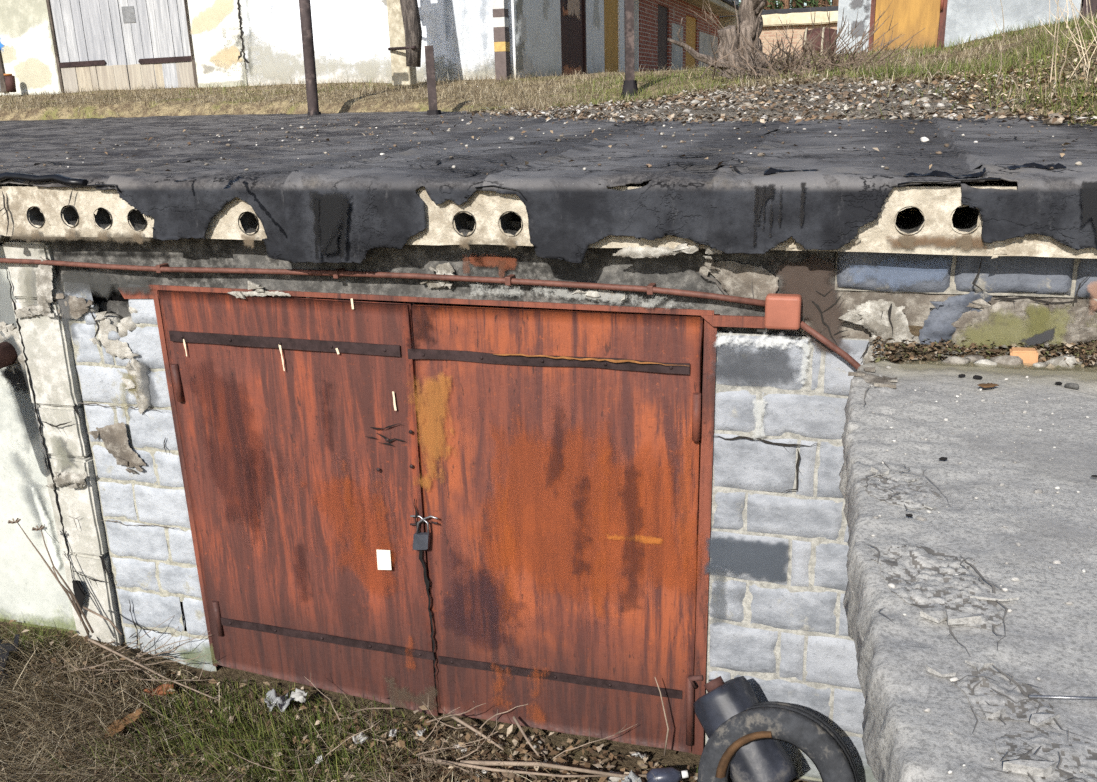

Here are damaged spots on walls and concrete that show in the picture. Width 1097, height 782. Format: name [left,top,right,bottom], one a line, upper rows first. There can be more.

peeling [0,20,60,95]
peeling [187,0,245,84]
crack [237,0,249,71]
peeling [563,0,580,19]
crack [0,134,315,236]
rust [463,255,516,278]
spalling [0,255,150,414]
crack [5,267,183,650]
spalling [88,422,146,473]
spalling [860,462,941,513]
spalling [871,544,1019,636]
spalling [926,660,1097,782]